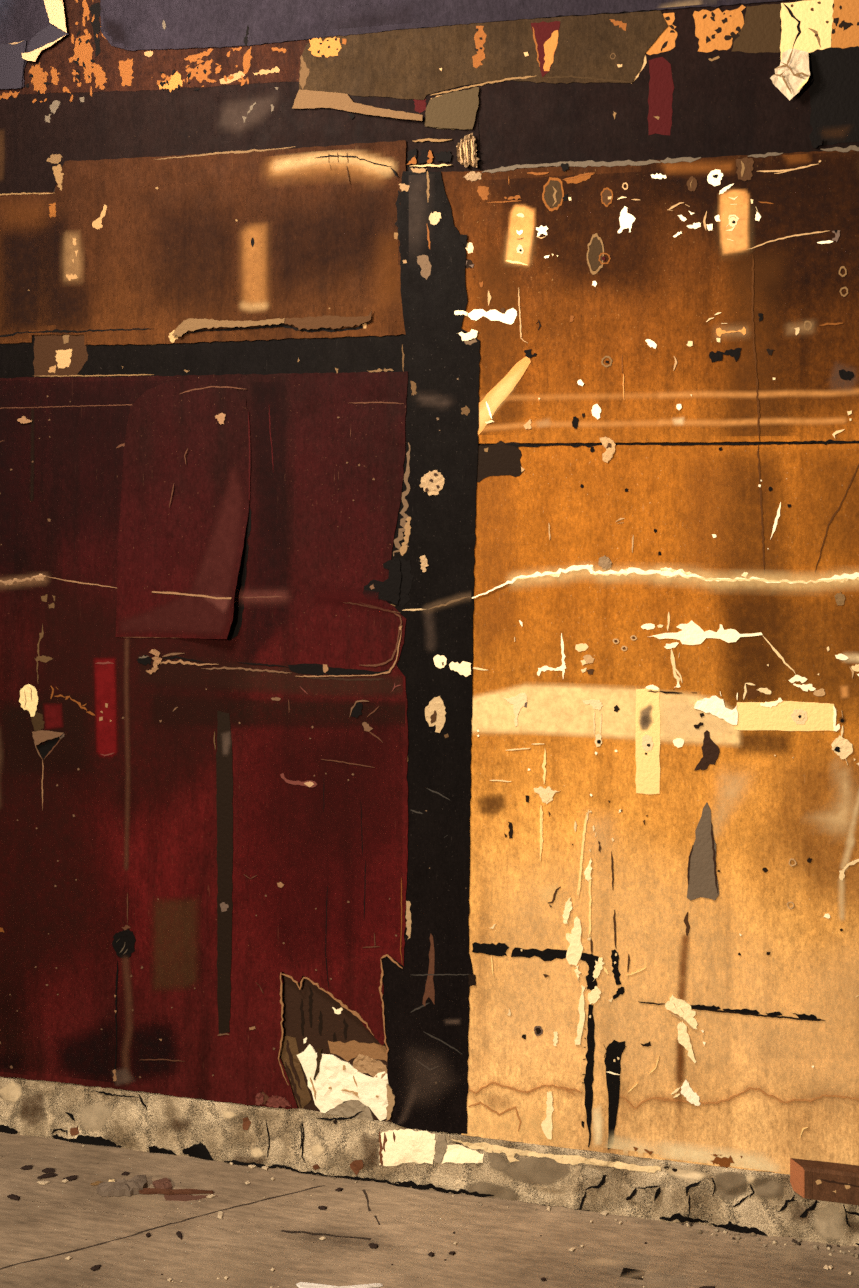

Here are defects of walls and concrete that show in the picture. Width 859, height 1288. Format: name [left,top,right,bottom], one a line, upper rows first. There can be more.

rust [0,0,319,103]
peeling [646,13,677,55]
peeling [693,4,810,101]
crack [343,374,859,613]
crack [0,576,116,588]
crack [36,624,44,681]
spalling [641,620,762,649]
crack [39,760,47,810]
crack [576,1175,859,1227]